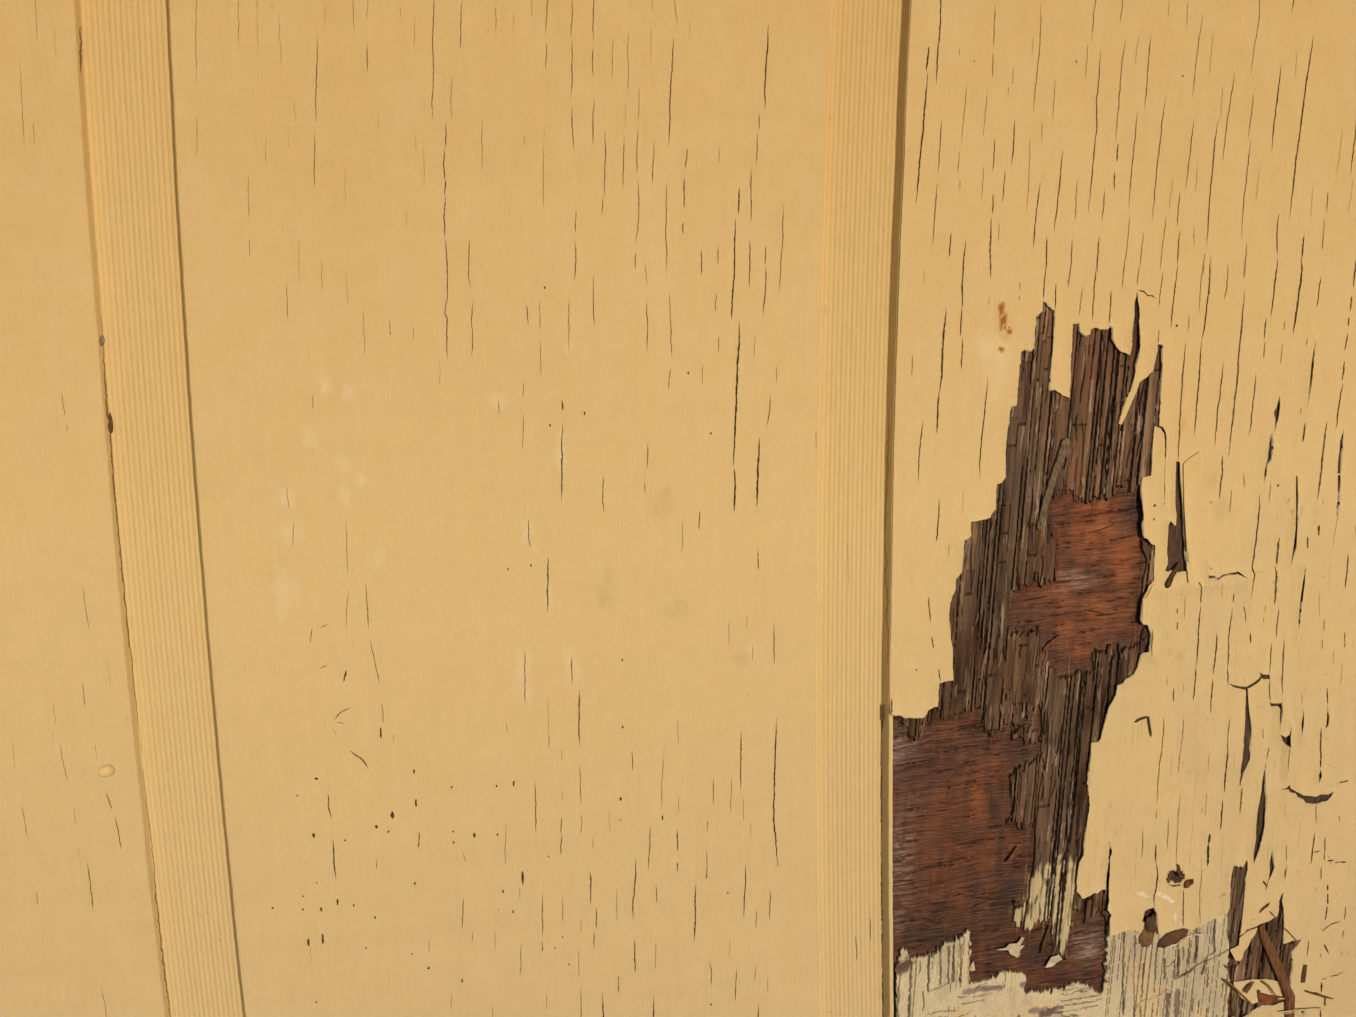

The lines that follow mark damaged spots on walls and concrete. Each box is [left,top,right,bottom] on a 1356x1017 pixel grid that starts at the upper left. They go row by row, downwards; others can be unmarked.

crack [238,2,281,53]
crack [248,0,368,255]
crack [286,0,473,385]
crack [495,0,784,509]
rust [997,301,1013,354]
crack [310,533,394,768]
crack [528,520,549,611]
crack [728,621,775,662]
peeling [880,296,1300,1017]
crack [884,0,1356,1017]
crack [328,795,336,876]
crack [462,656,778,1017]